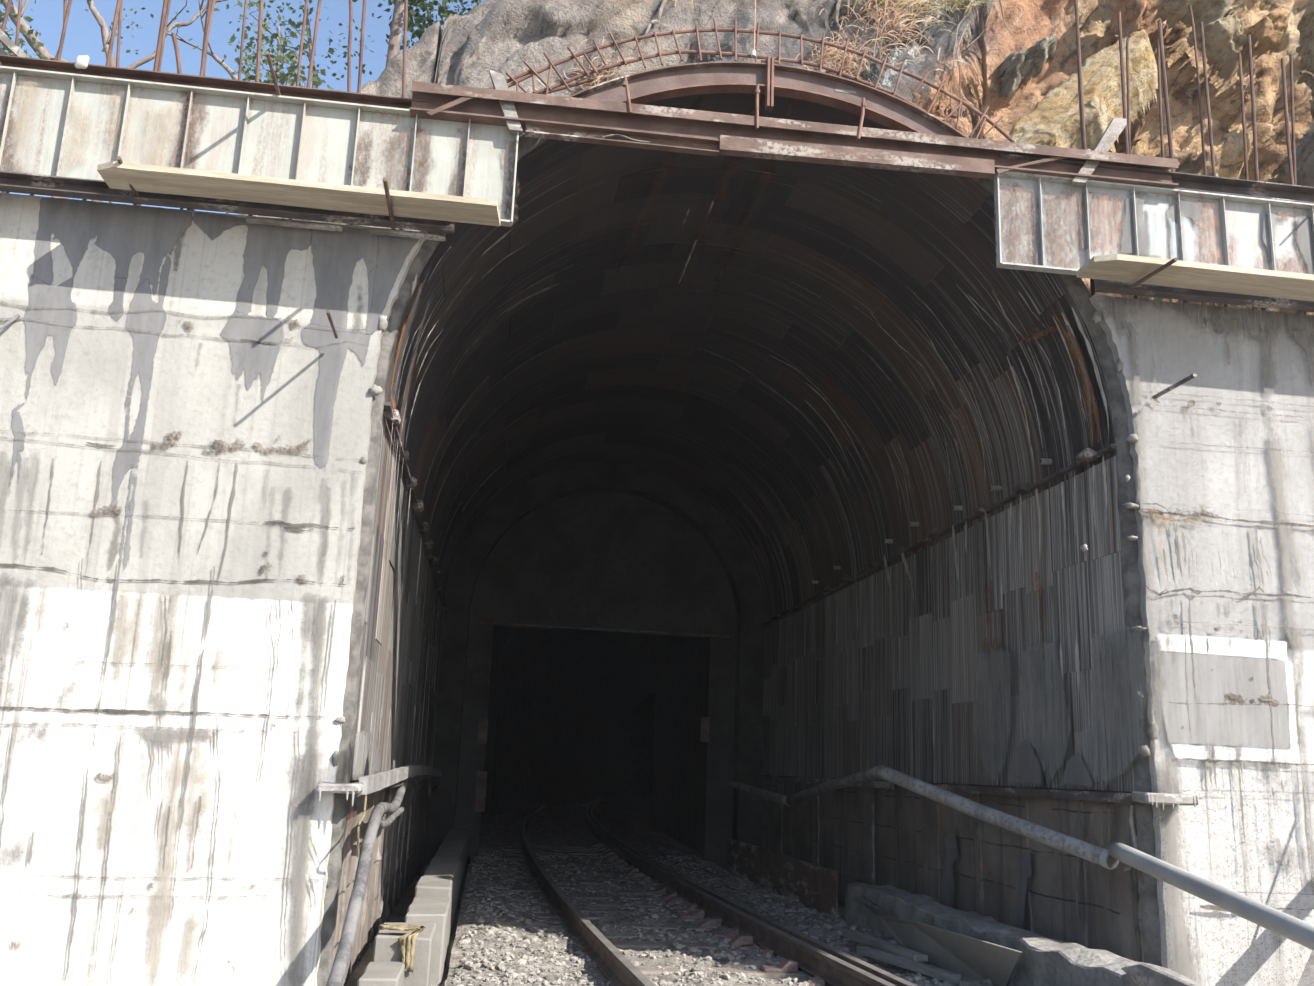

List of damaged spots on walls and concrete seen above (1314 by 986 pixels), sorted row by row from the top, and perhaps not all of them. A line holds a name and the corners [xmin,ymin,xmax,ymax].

corrosion [0,84,26,173]
corrosion [171,94,208,169]
corrosion [350,128,433,192]
corrosion [451,130,466,196]
corrosion [501,142,516,219]
corrosion [994,183,1124,269]
corrosion [1195,201,1233,265]
leakage [1105,294,1314,588]
leakage [0,198,419,986]
crack [1144,585,1314,631]
leakage [1254,424,1306,790]